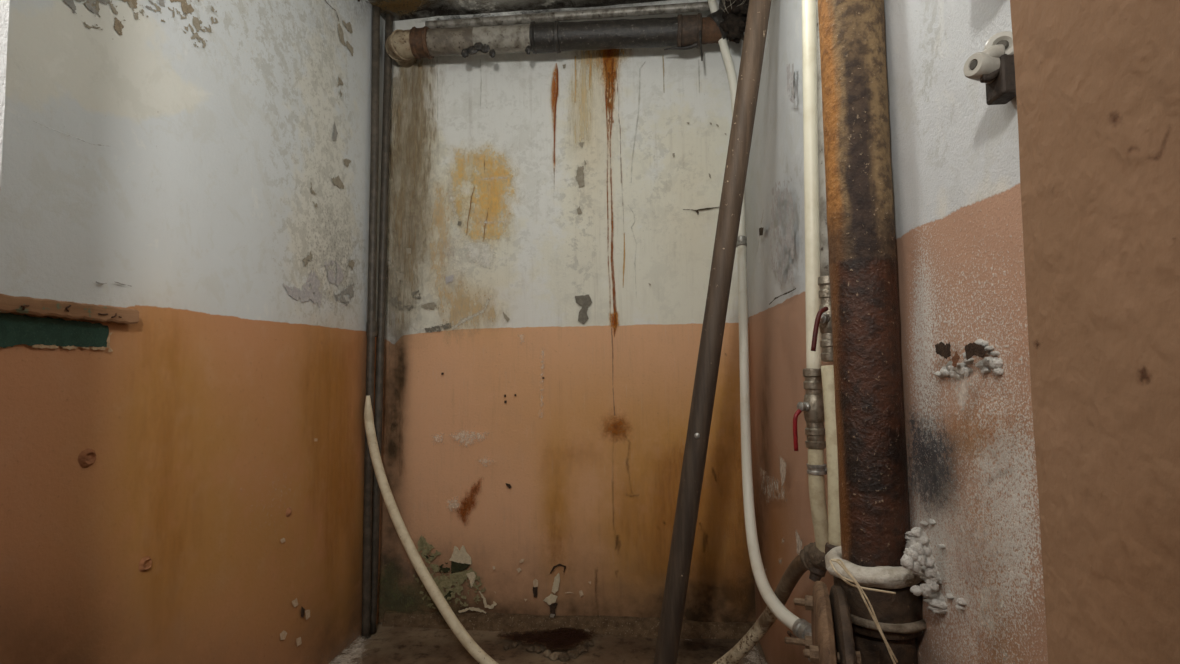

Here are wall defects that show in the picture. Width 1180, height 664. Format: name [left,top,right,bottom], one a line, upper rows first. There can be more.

peeling [63,0,218,48]
peeling [337,20,354,56]
peeling [331,158,351,189]
damp [387,59,514,329]
peeling [576,142,586,187]
corrosion [585,49,625,367]
peeling [283,251,355,308]
peeling [575,294,592,324]
spalling [934,339,1004,405]
damp [907,413,954,510]
corrosion [457,483,479,522]
peeling [377,535,497,618]